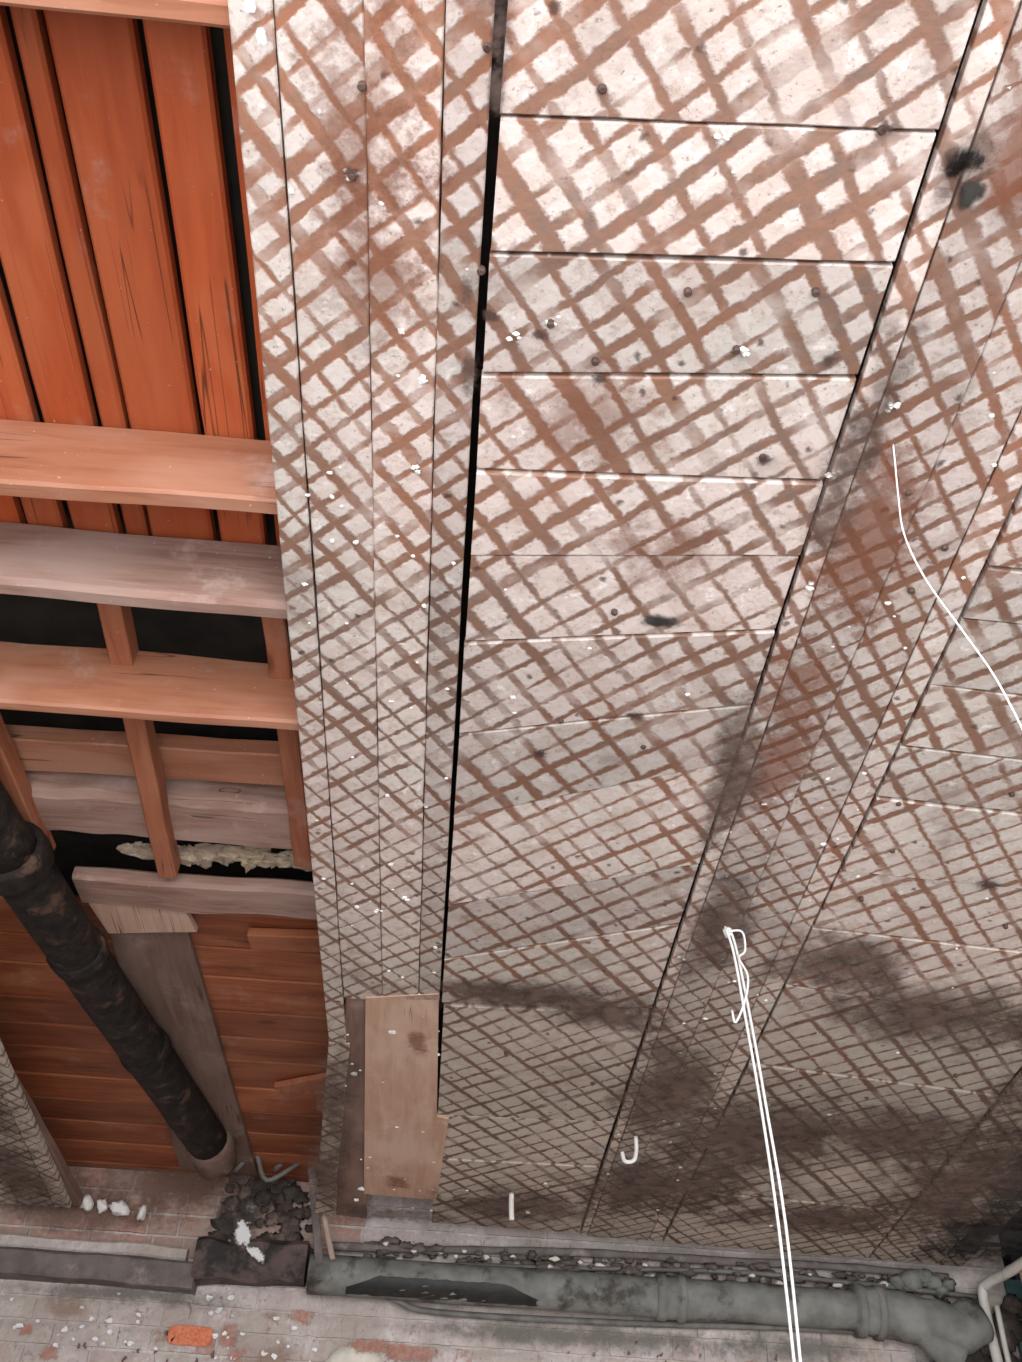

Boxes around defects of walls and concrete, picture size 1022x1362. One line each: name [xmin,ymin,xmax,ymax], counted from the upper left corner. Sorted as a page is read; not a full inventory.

water stain [936,137,981,202]
water stain [811,328,908,552]
water stain [702,717,758,848]
water stain [680,875,751,975]
water stain [764,936,1022,1052]
water stain [439,982,1022,1267]
peeling [12,1319,40,1335]
peeling [39,1295,245,1362]
peeling [261,1309,313,1360]